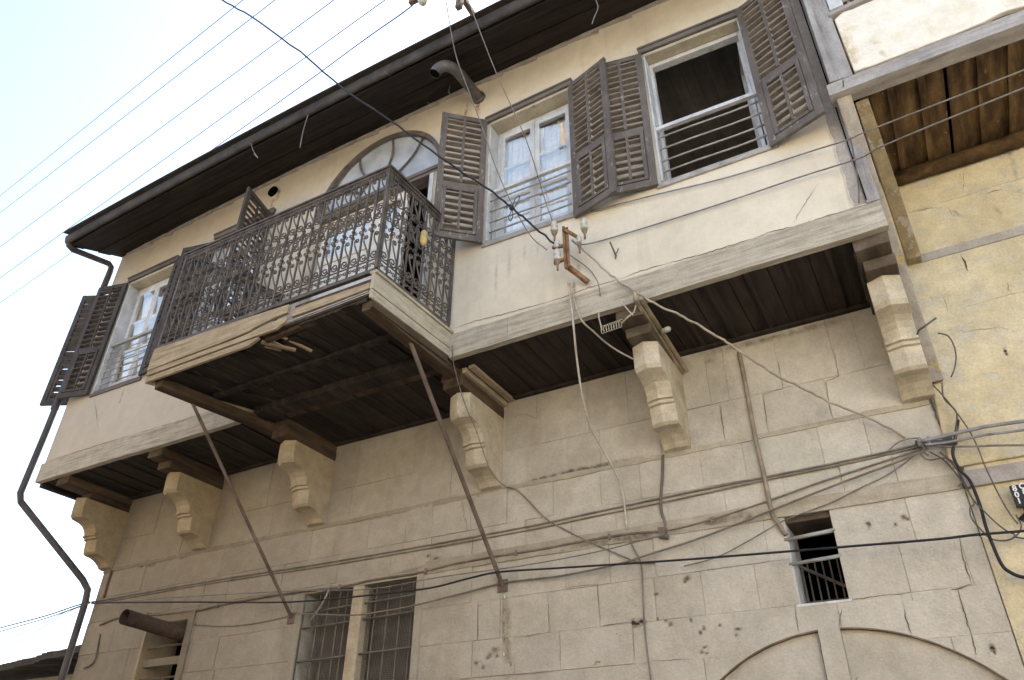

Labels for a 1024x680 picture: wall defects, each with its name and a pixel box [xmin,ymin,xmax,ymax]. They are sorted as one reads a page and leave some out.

crack [457,185,842,328]